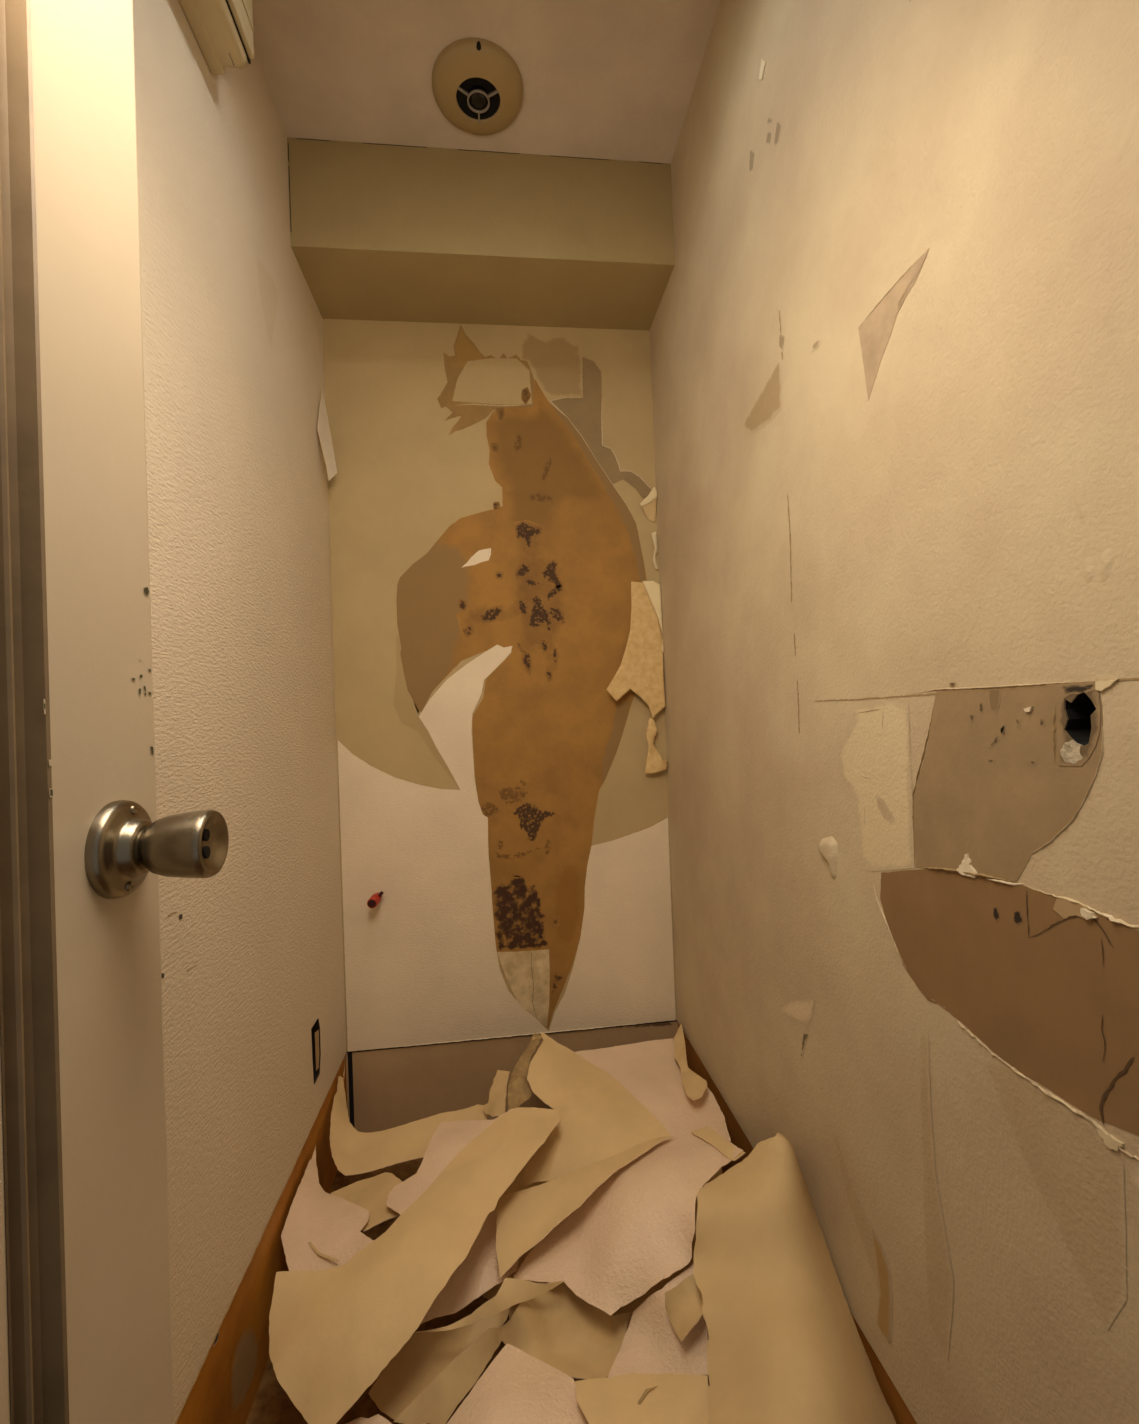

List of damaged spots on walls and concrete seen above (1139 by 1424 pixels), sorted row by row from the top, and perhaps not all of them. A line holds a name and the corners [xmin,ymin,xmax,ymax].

peeling [858,249,929,401]
damp [458,521,566,682]
peeling [396,380,647,1028]
peeling [912,679,1119,882]
damp [480,778,560,952]
damp [551,971,566,999]
peeling [1011,1067,1082,1116]
peeling [1096,1124,1125,1151]
crack [1099,1014,1134,1125]